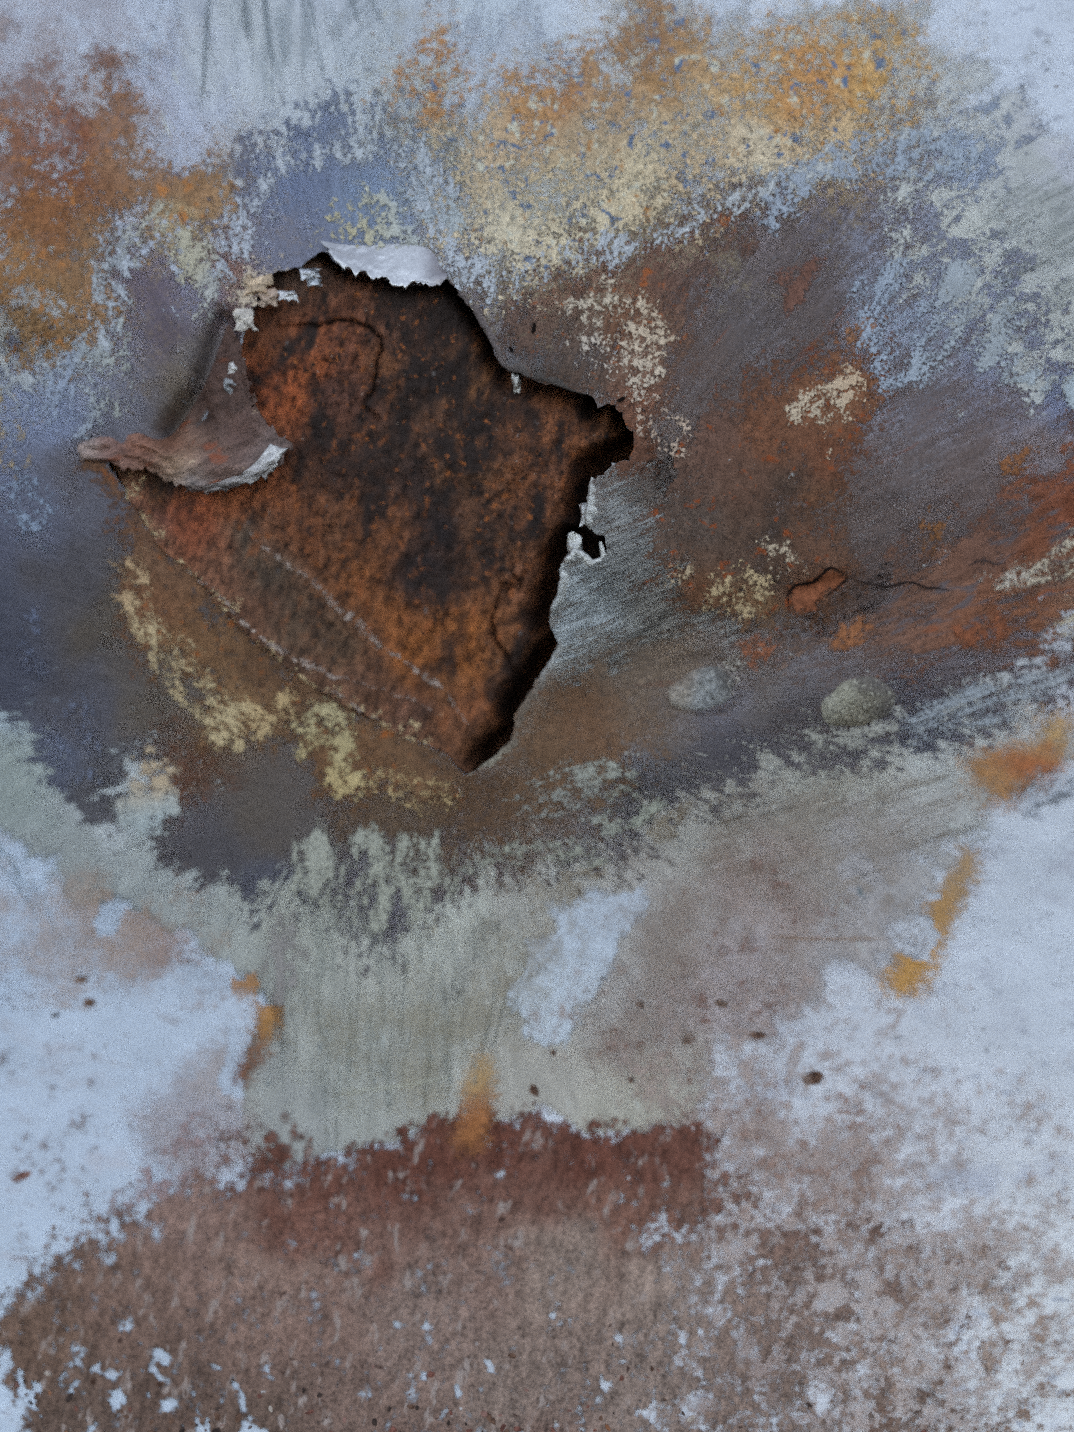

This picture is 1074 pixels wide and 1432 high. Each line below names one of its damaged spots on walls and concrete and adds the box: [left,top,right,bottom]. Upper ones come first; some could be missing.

rust [0,6,258,479]
rust [73,0,1074,896]
peeling [396,719,421,745]
rust [879,845,983,998]